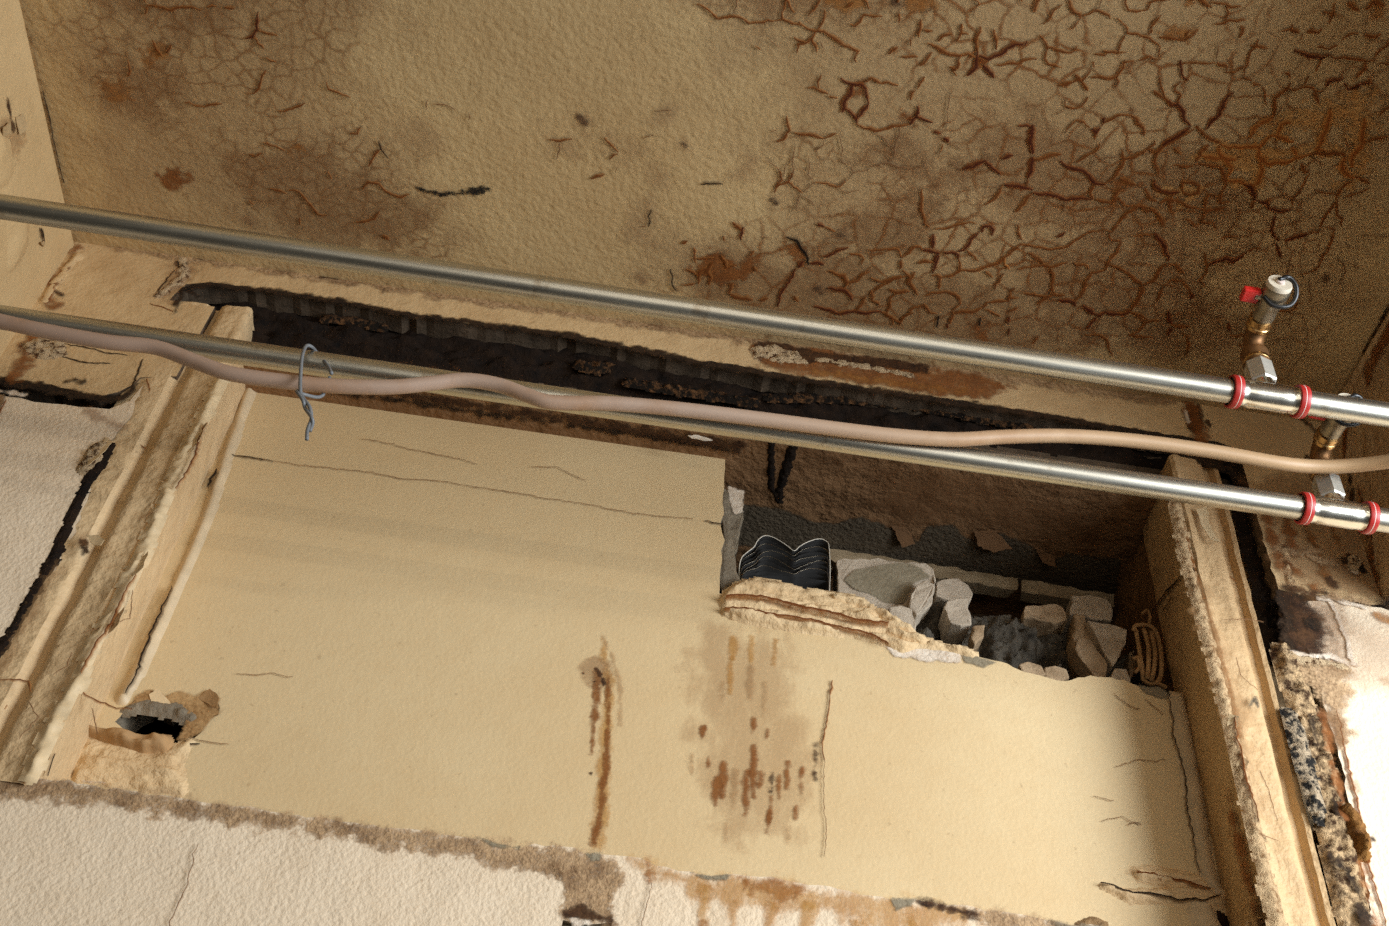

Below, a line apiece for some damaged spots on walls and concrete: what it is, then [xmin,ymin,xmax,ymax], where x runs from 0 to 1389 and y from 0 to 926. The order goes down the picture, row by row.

crack [43,92,64,181]
crack [91,0,426,246]
crack [549,110,670,179]
spalling [738,505,1121,594]
peeling [0,378,625,926]
corrosion [583,647,613,844]
corrosion [707,718,817,824]
crack [821,680,833,855]
peeling [1167,501,1289,926]
flaking render [1269,642,1387,926]
corrosion [643,857,979,926]
peeling [976,908,1109,926]